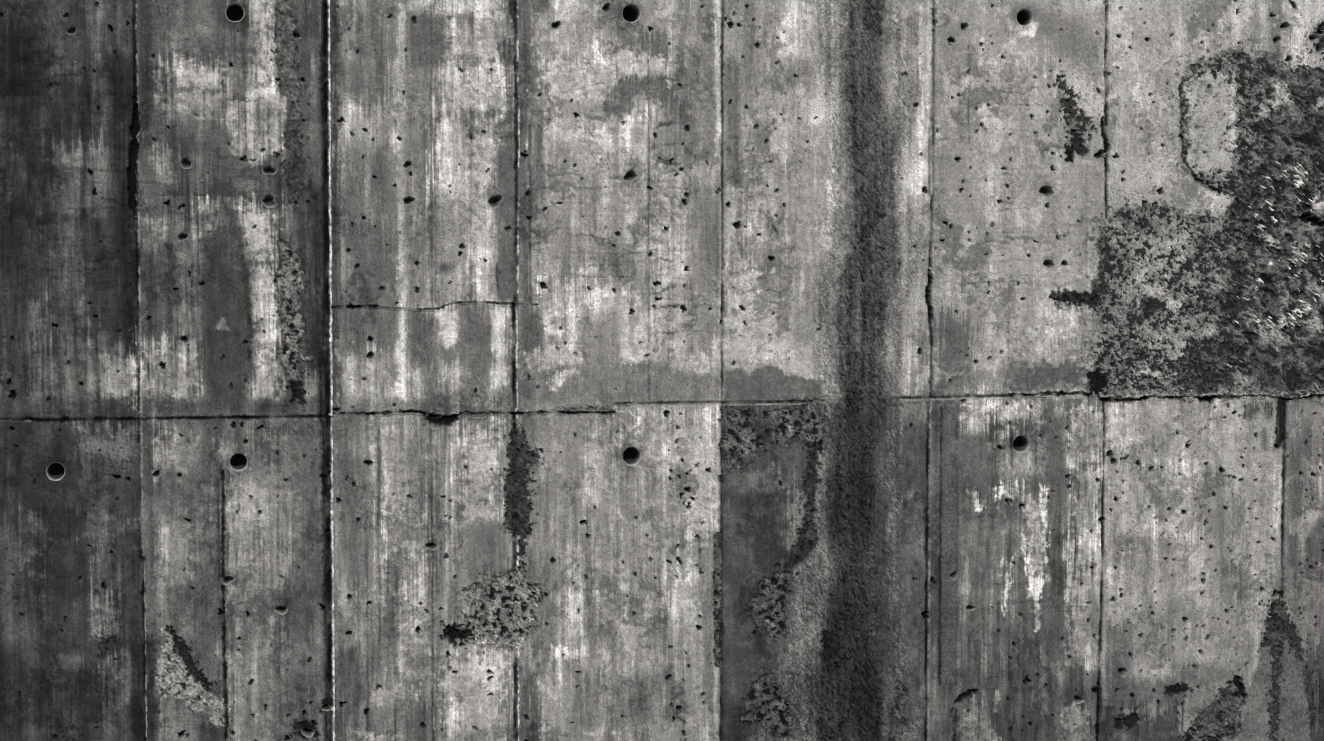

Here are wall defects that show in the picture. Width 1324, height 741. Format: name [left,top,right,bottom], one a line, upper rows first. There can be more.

spalling [266,229,315,412]
crack [331,261,540,311]
water stain [397,0,985,741]
spalling [1044,19,1324,403]
spalling [438,421,548,655]
spalling [712,396,832,669]
spalling [145,615,241,733]
spalling [731,667,800,741]
spalling [1161,680,1194,703]
spalling [1170,667,1254,741]